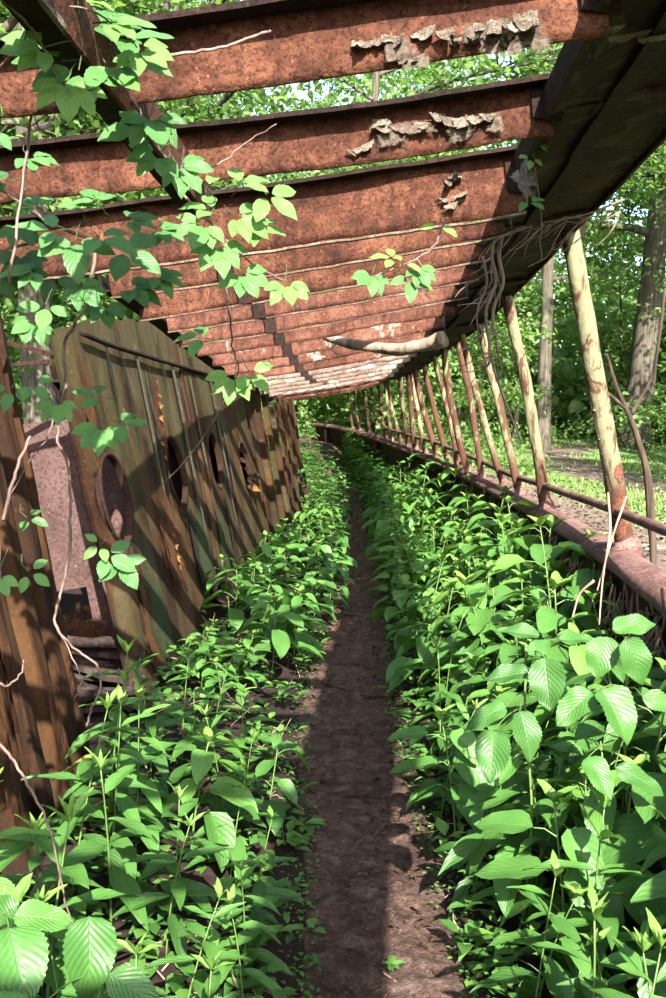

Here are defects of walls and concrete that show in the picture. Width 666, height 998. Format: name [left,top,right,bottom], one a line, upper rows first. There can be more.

peeling [351,9,552,70]
peeling [345,112,504,157]
peeling [438,170,467,209]
rust [153,376,168,466]
rust [159,486,192,605]
rust [63,607,110,647]
rust [135,563,166,682]